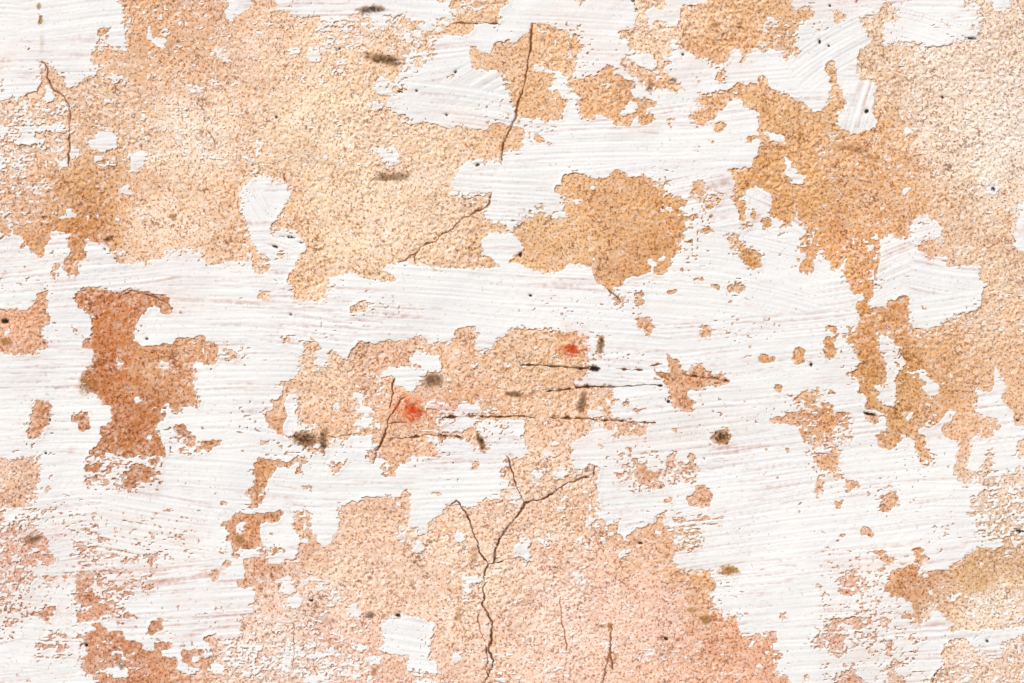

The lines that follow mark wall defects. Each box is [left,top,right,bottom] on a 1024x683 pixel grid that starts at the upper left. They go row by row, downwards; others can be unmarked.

crack [39,61,71,167]
peeling [0,0,828,356]
crack [398,193,492,263]
crack [501,23,533,165]
crack [373,378,406,463]
peeling [0,278,791,683]
crack [449,456,595,682]
peeling [684,0,1024,683]